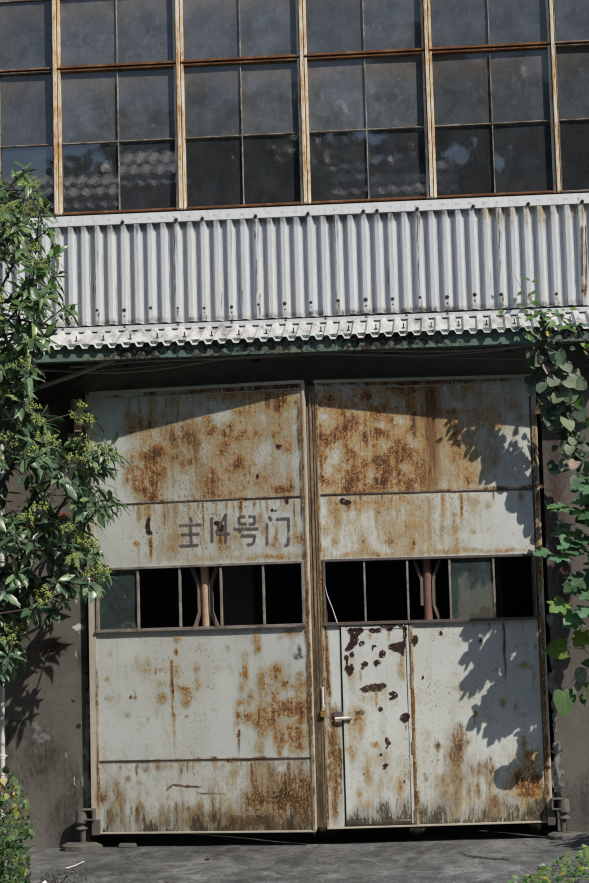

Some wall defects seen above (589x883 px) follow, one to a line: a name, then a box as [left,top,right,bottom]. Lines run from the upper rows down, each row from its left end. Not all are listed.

corrosion [96,378,550,832]
peeling [344,624,419,676]
peeling [359,683,398,700]